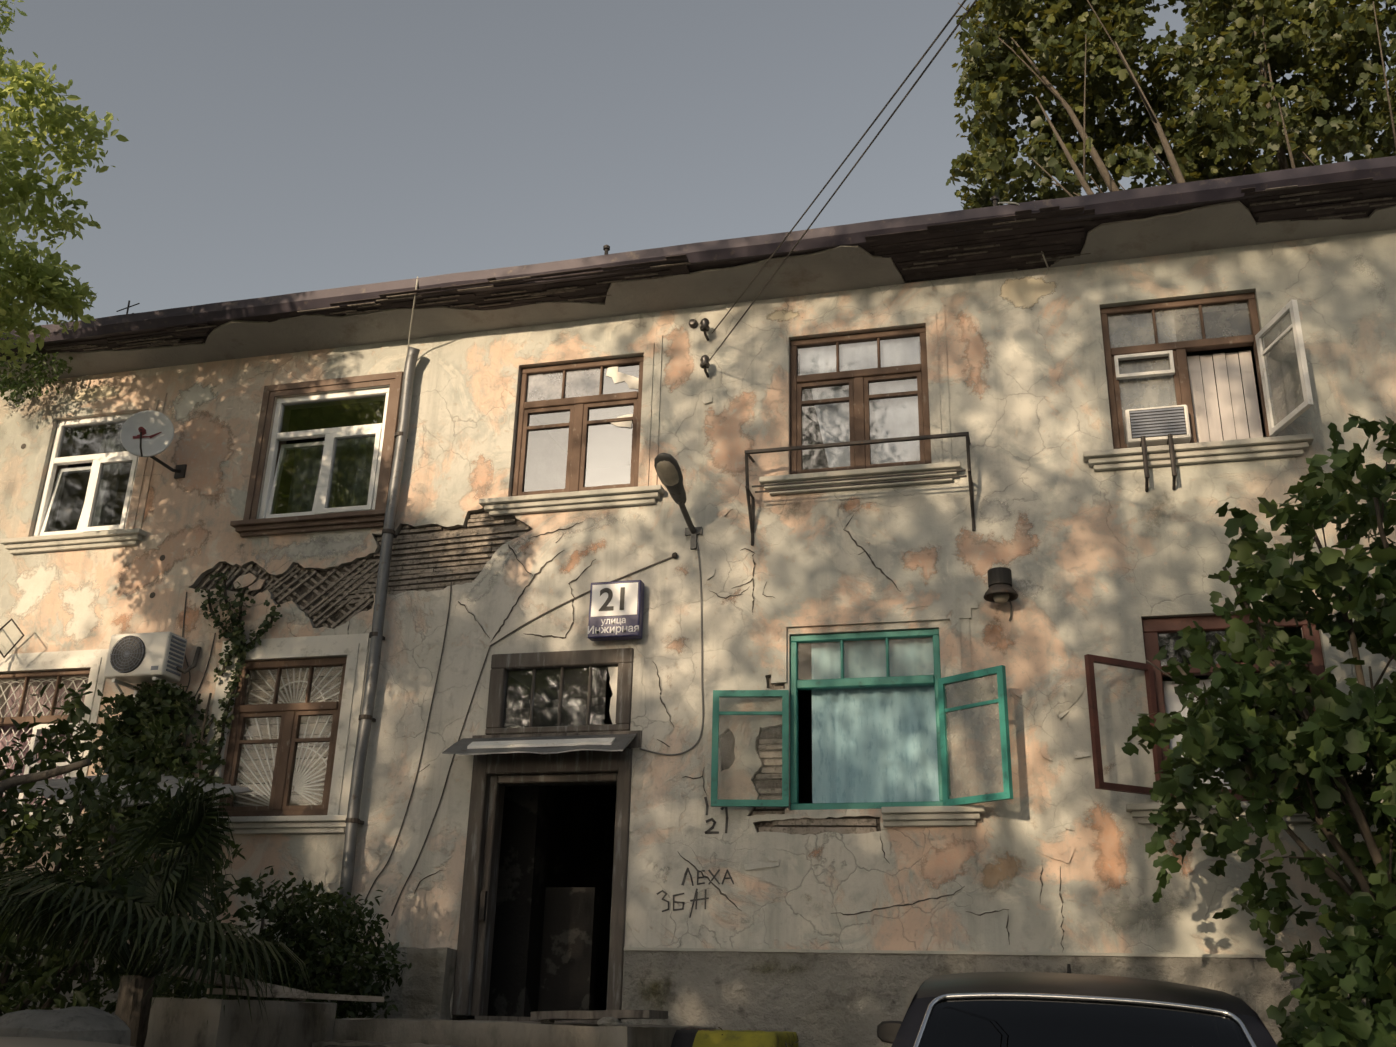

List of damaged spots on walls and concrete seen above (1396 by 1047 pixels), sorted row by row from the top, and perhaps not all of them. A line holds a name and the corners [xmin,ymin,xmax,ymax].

peeling [171,381,234,500]
peeling [701,392,756,476]
peeling [10,563,131,641]
peeling [118,520,210,598]
flaking render [193,455,533,629]
crack [458,522,596,641]
crack [843,516,901,592]
peeling [956,514,1040,578]
crack [653,662,674,747]
crack [678,852,740,910]
crack [831,886,1010,945]
crack [1040,867,1066,952]